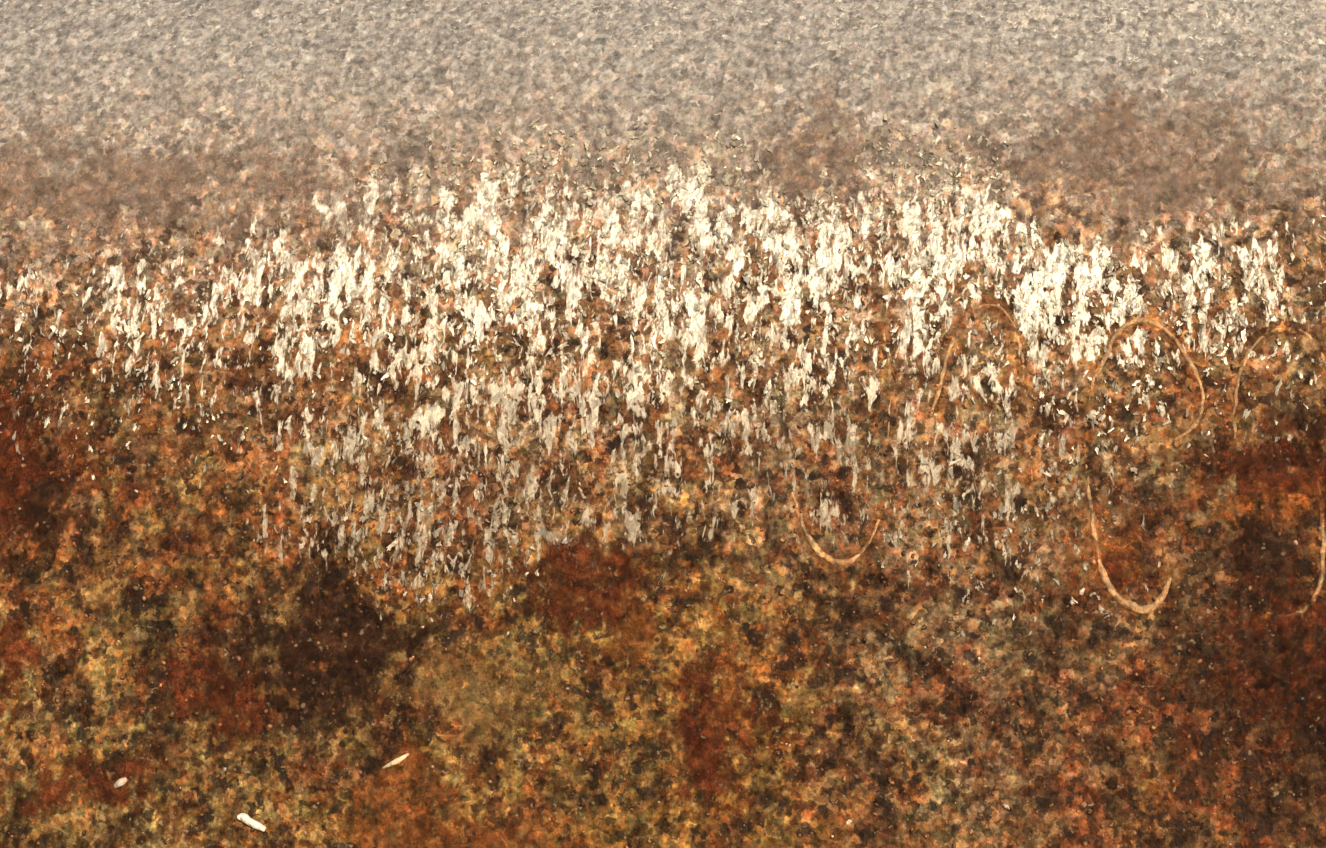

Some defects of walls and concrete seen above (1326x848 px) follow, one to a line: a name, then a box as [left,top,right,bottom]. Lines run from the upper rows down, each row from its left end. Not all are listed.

rust [0,610,40,730]
rust [0,389,85,583]
rust [16,750,159,820]
rust [159,535,559,848]
rust [502,497,659,668]
rust [655,603,785,817]
rust [1064,529,1142,599]
rust [1185,402,1326,767]